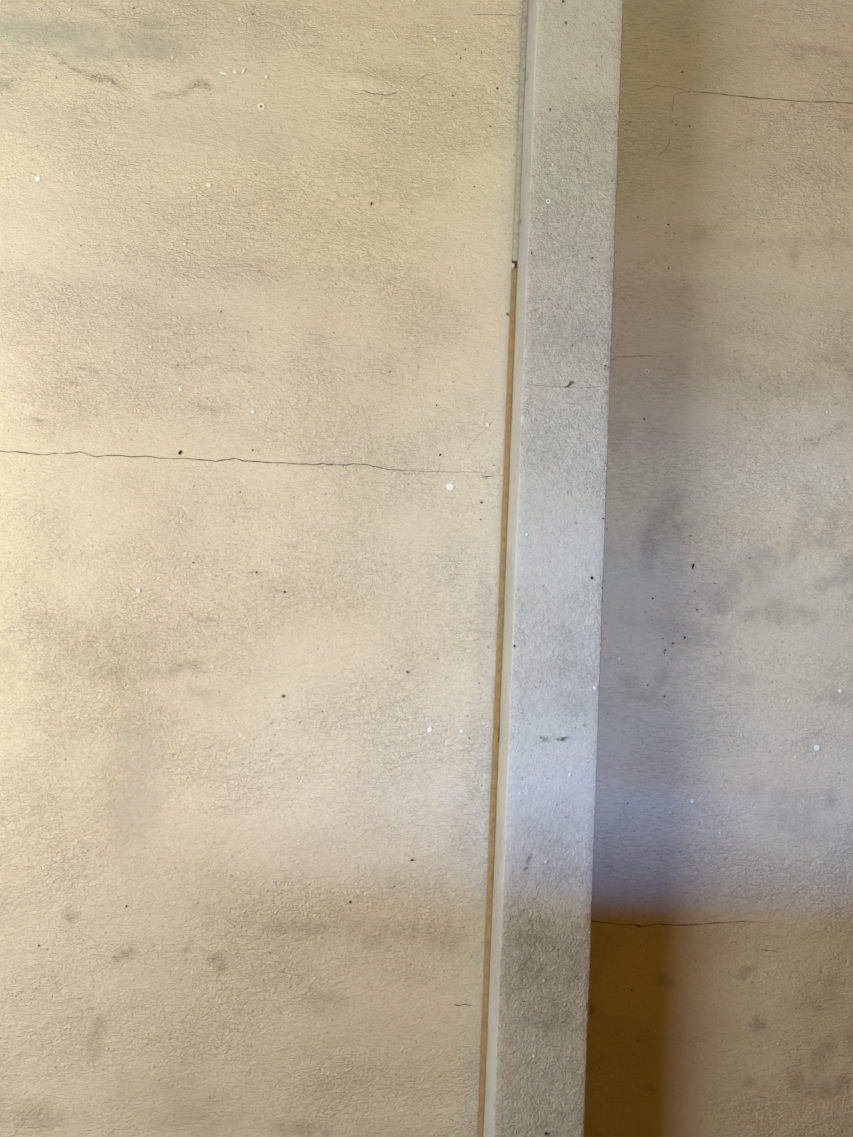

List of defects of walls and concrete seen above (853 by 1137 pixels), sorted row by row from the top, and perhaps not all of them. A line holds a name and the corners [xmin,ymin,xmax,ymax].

crack [646,87,853,147]
crack [1,451,439,473]